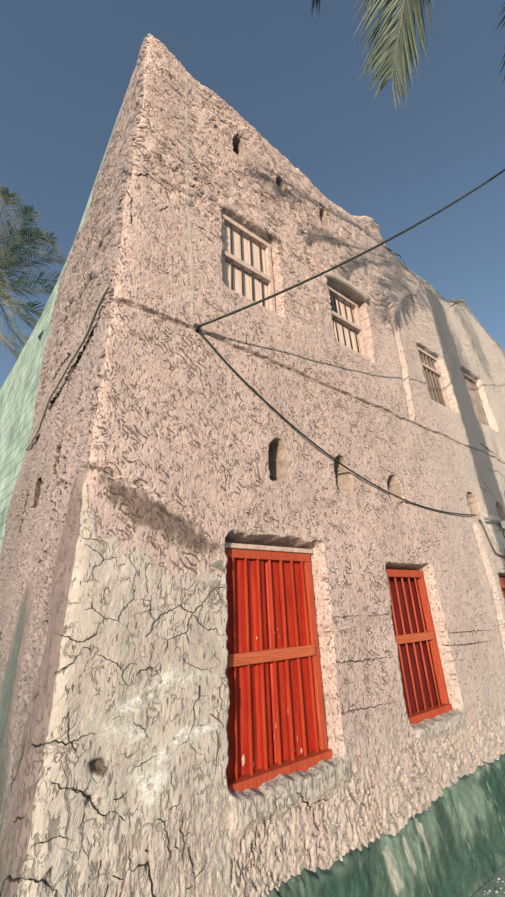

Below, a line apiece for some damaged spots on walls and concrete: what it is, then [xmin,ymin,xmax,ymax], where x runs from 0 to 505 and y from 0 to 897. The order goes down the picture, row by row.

crack [31,273,94,448]
crack [11,709,90,788]
crack [30,534,226,848]
crack [442,629,496,646]
crack [0,870,57,897]
crack [97,776,206,897]